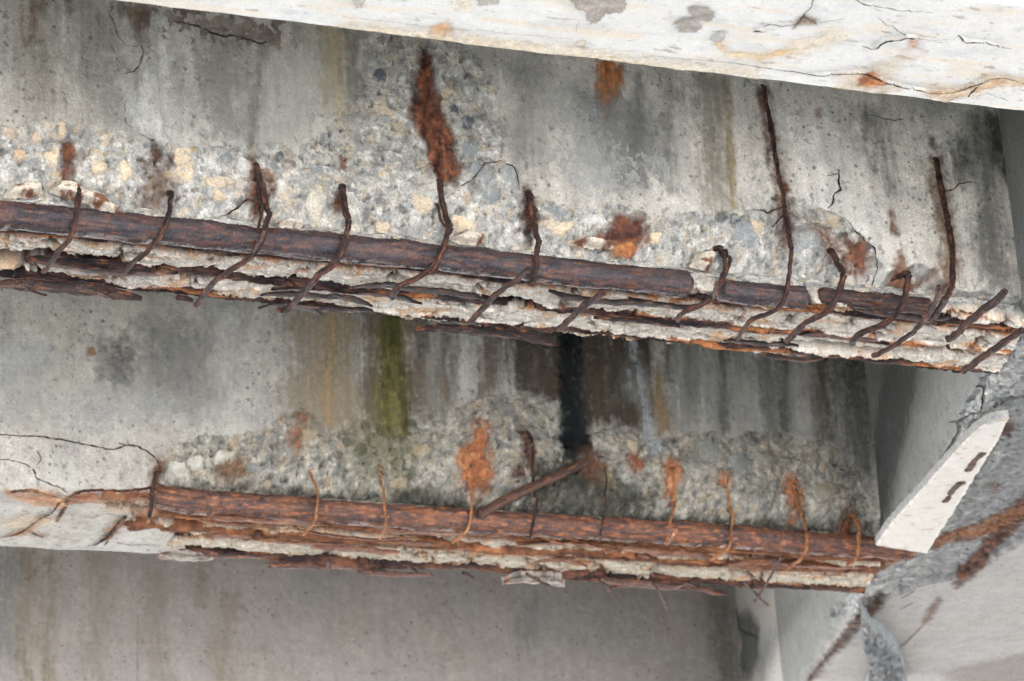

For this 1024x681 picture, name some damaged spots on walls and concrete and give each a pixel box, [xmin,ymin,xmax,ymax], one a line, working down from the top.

corrosion [348,23,793,183]
crack [659,0,1024,102]
corrosion [258,281,487,316]
spalling [0,33,1024,537]
corrosion [548,289,695,328]
crack [828,172,878,285]
damp [284,309,468,435]
damp [478,326,838,532]
crack [0,434,161,547]
damp [278,478,467,508]
spalling [104,501,993,619]
spalling [977,517,1024,569]